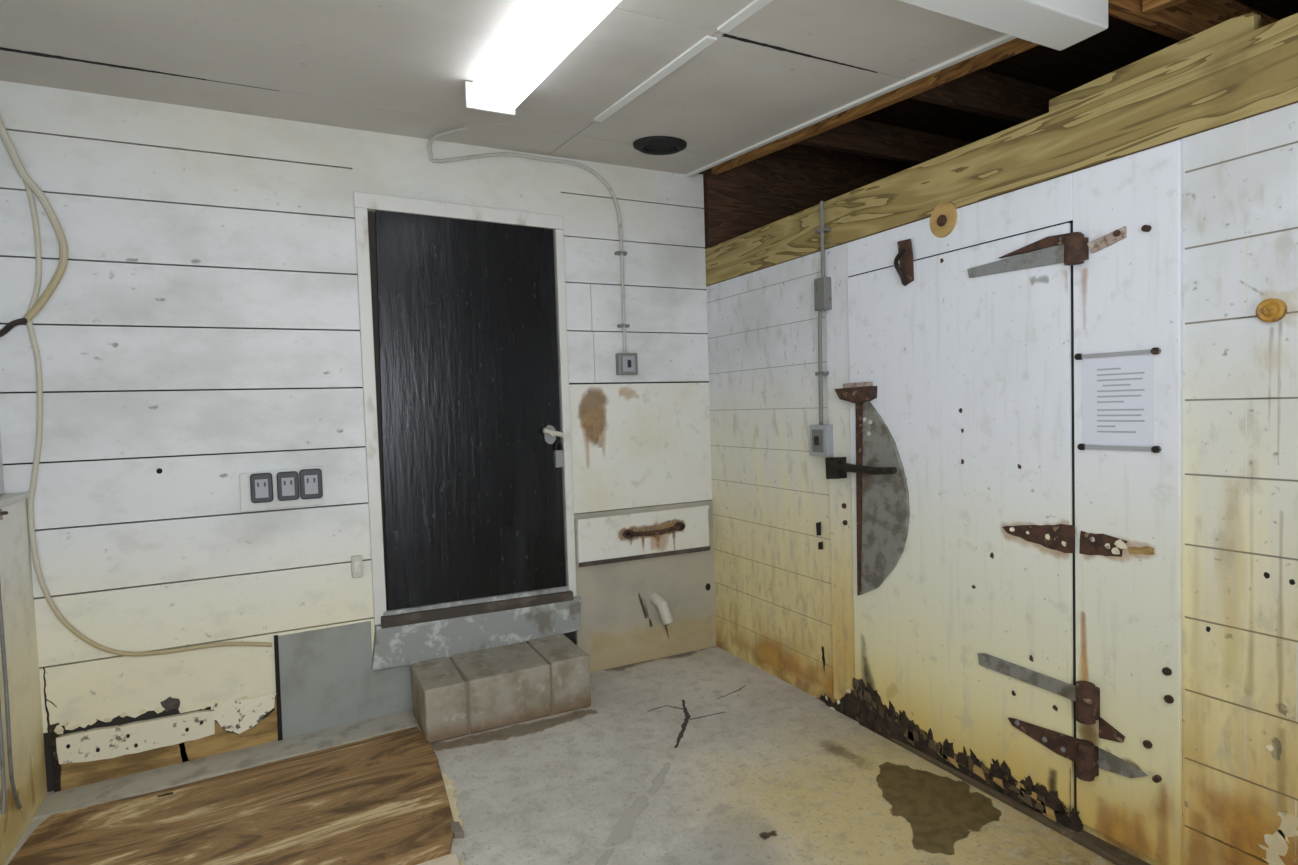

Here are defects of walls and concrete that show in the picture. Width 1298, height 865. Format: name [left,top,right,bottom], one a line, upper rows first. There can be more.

corrosion [580,391,606,443]
peeling [53,694,275,735]
crack [596,685,745,865]
spalling [1266,736,1283,761]
leakage [876,762,1002,855]
spalling [1259,810,1298,865]